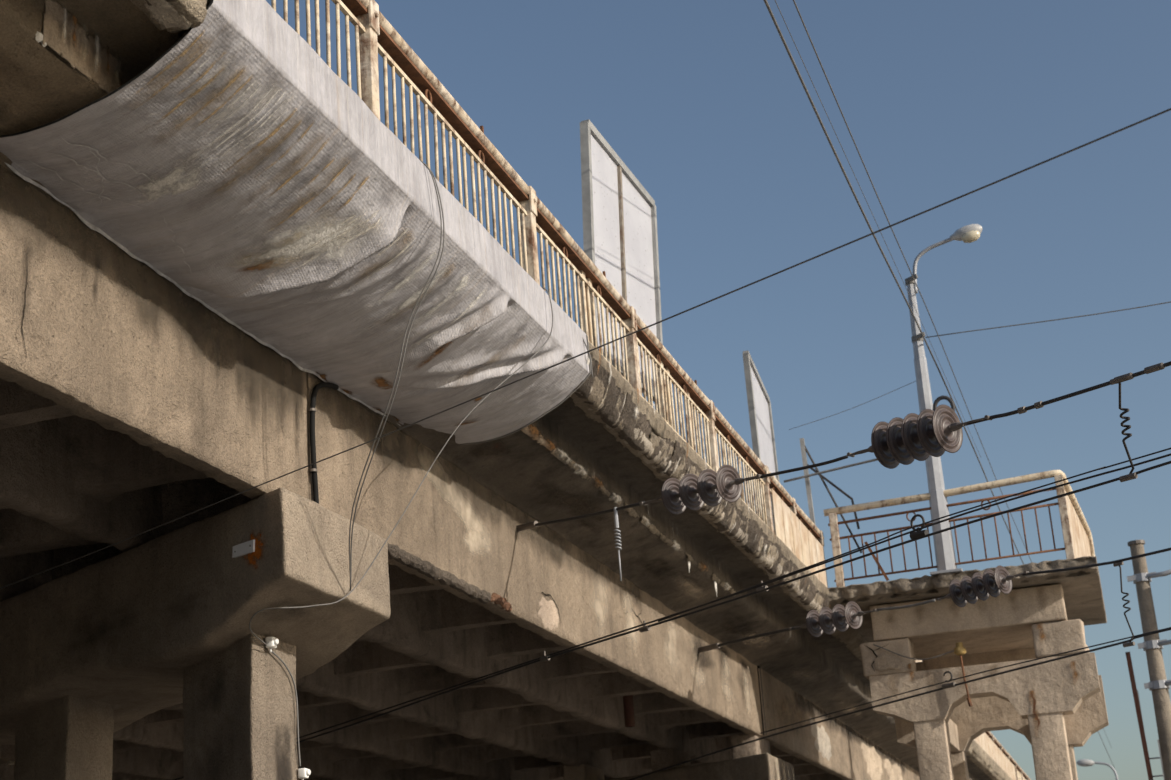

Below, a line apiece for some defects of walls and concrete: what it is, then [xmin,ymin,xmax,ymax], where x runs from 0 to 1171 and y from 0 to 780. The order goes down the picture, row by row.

spalling [137,0,207,33]
rust [149,32,251,129]
leakage [29,81,286,272]
rust [224,113,368,224]
leakage [242,212,381,271]
crack [17,267,32,355]
leakage [0,174,303,428]
spalling [570,348,713,481]
leakage [318,378,640,640]
spalling [551,448,736,594]
spalling [387,542,512,612]
peeling [538,592,561,631]